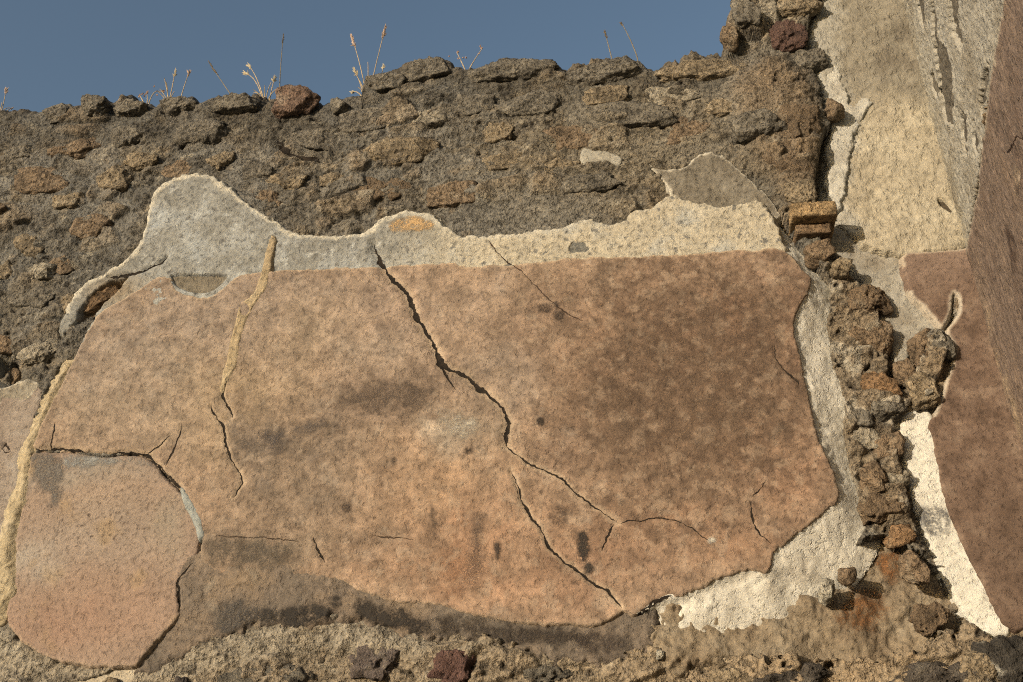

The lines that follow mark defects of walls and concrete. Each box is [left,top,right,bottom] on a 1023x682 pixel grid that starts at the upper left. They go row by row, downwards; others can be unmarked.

spalling [919,0,979,152]
spalling [569,242,589,253]
spalling [173,276,227,293]
crack [36,423,181,490]
crack [211,393,243,496]
crack [374,241,708,616]
crack [218,535,324,560]
crack [176,564,191,611]